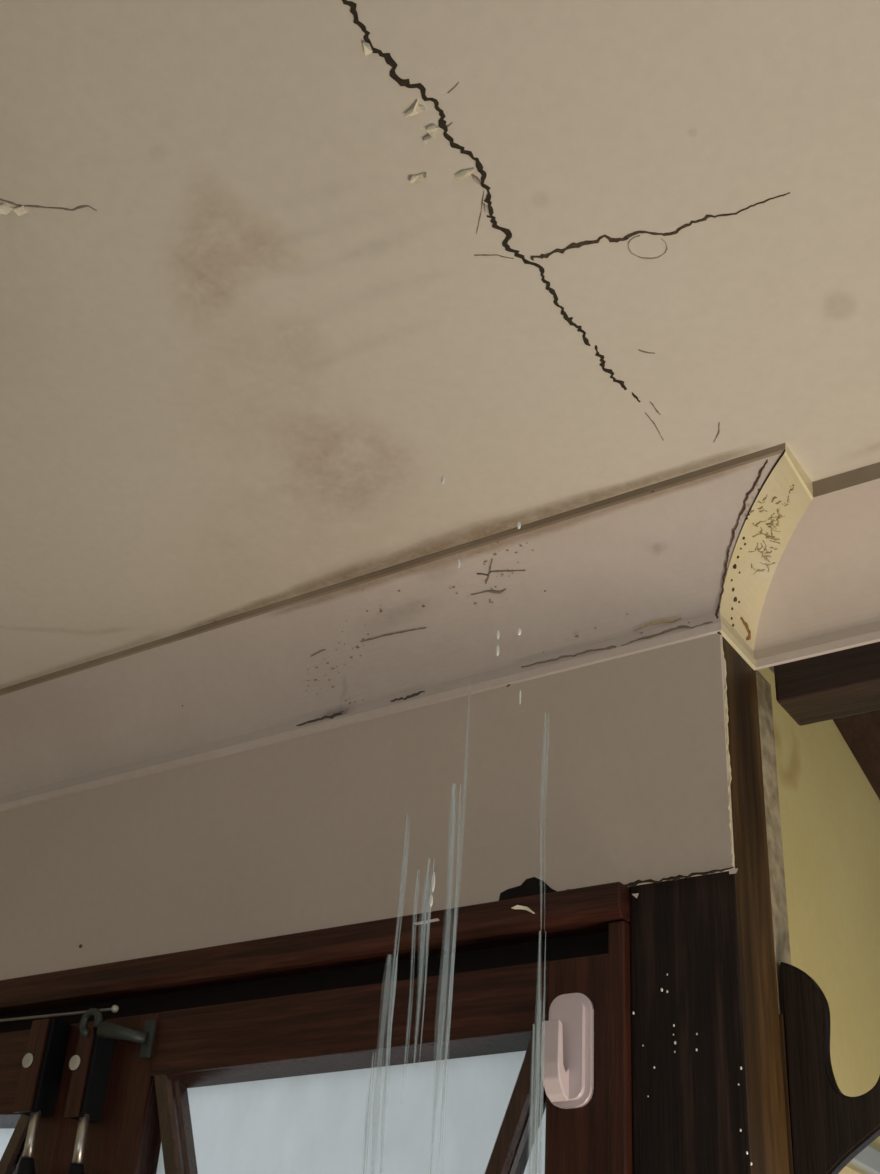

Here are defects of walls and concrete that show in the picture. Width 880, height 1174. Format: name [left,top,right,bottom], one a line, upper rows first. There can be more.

crack [0,198,97,216]
crack [342,0,790,441]